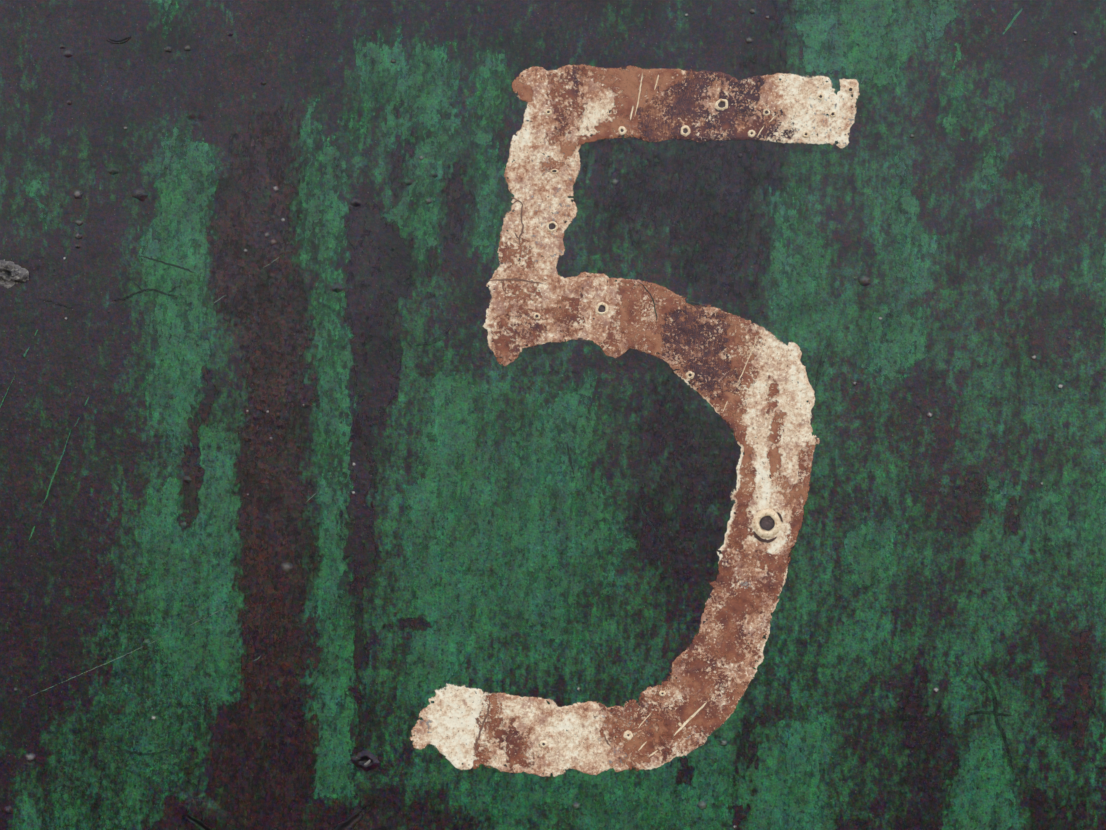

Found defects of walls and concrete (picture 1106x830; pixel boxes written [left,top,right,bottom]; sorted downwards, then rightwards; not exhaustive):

corrosion [512,64,796,176]
spalling [0,259,29,289]
corrosion [491,232,585,363]
corrosion [594,279,818,771]
corrosion [473,692,540,773]